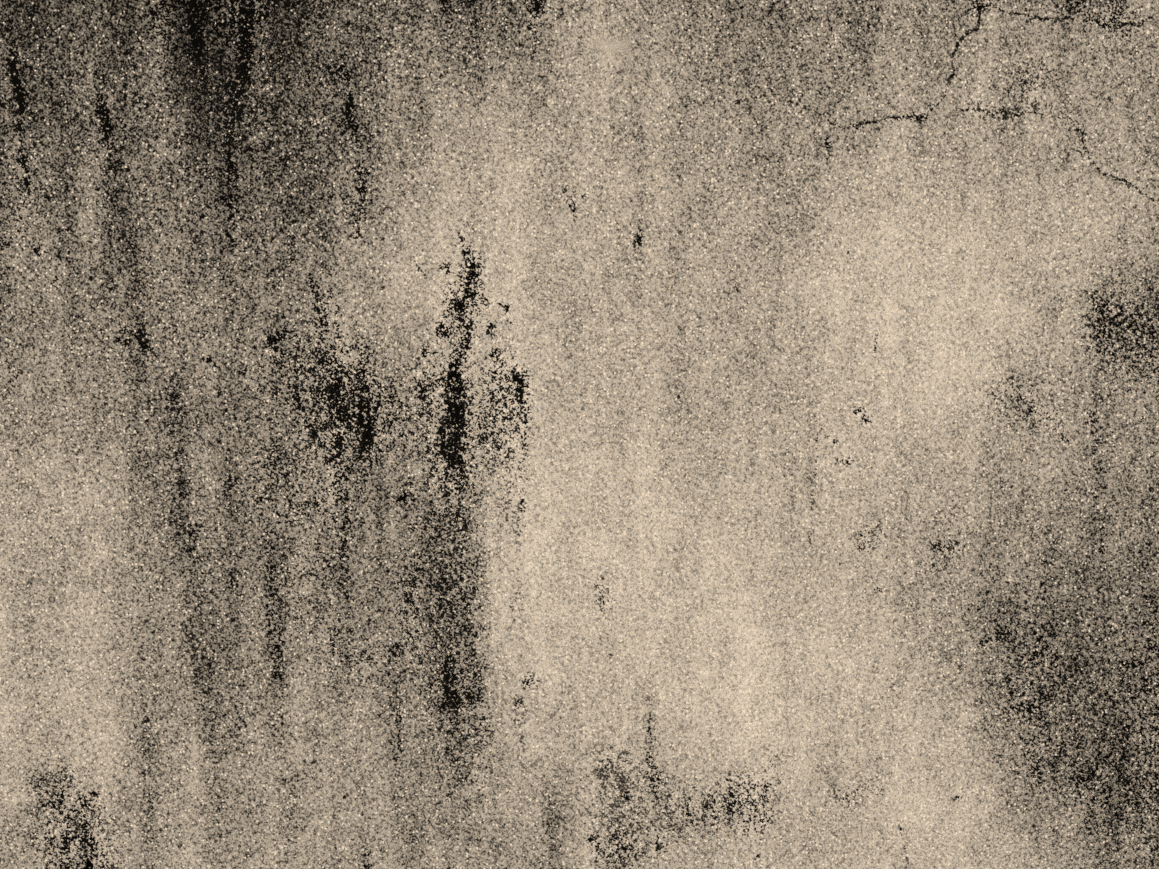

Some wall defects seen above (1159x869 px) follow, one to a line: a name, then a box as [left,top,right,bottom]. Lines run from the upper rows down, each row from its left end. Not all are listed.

damp [0,58,45,264]
damp [99,130,149,382]
damp [164,373,214,763]
damp [157,0,269,285]
damp [221,230,530,802]
crack [691,0,1159,201]
damp [992,376,1069,442]
damp [1085,410,1103,471]
damp [1082,282,1159,398]
damp [514,672,539,737]
damp [973,581,1159,857]